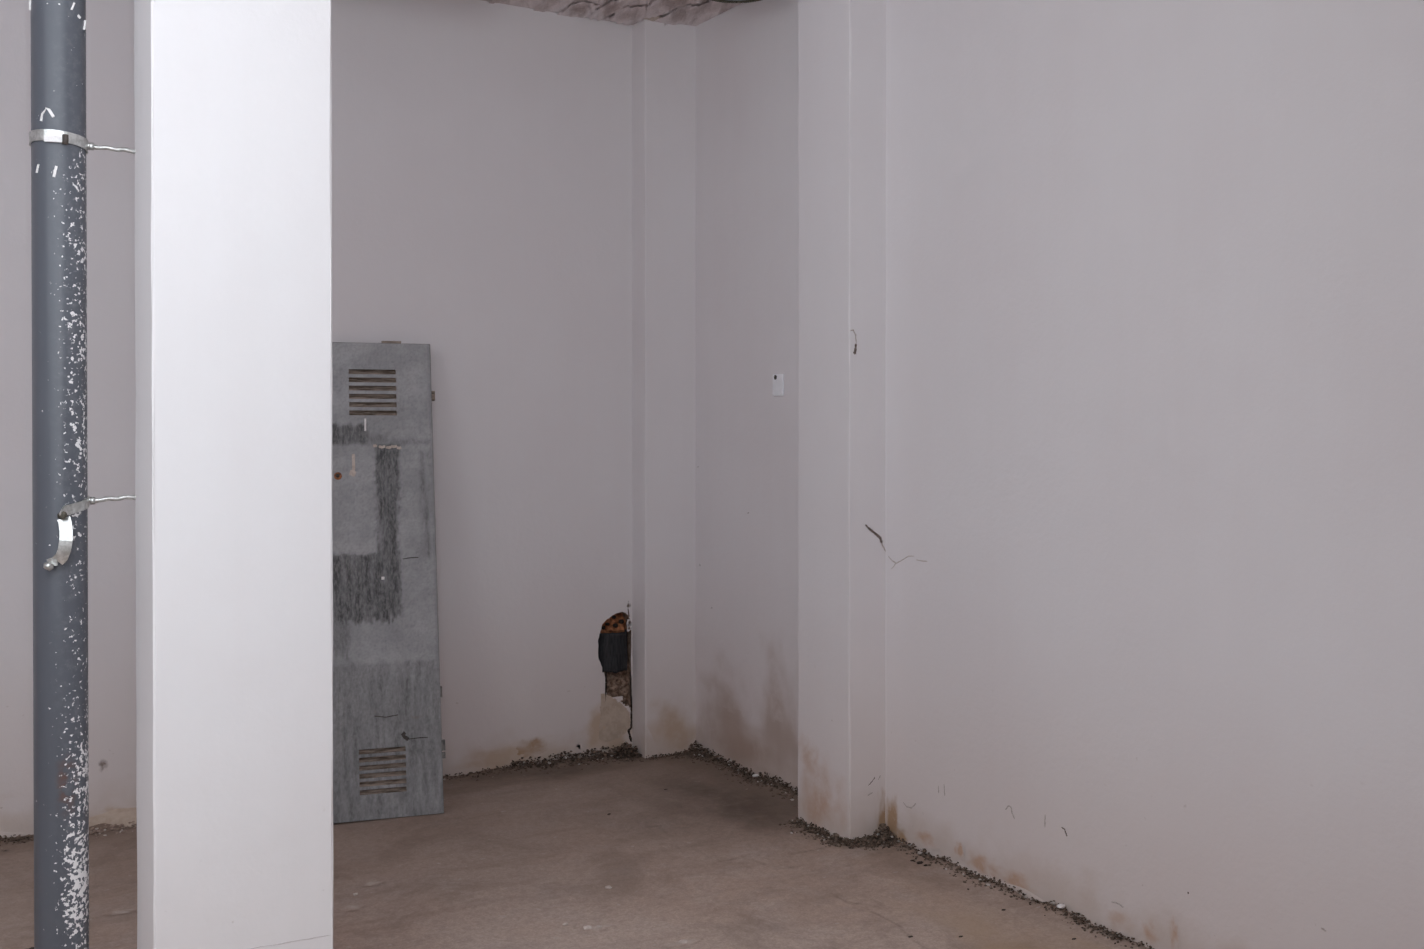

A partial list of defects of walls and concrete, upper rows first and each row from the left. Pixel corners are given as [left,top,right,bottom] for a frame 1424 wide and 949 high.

crack [865,524,927,569]
spalling [600,601,632,633]
spalling [599,663,632,742]
damp [443,617,848,840]
damp [830,866,1133,949]